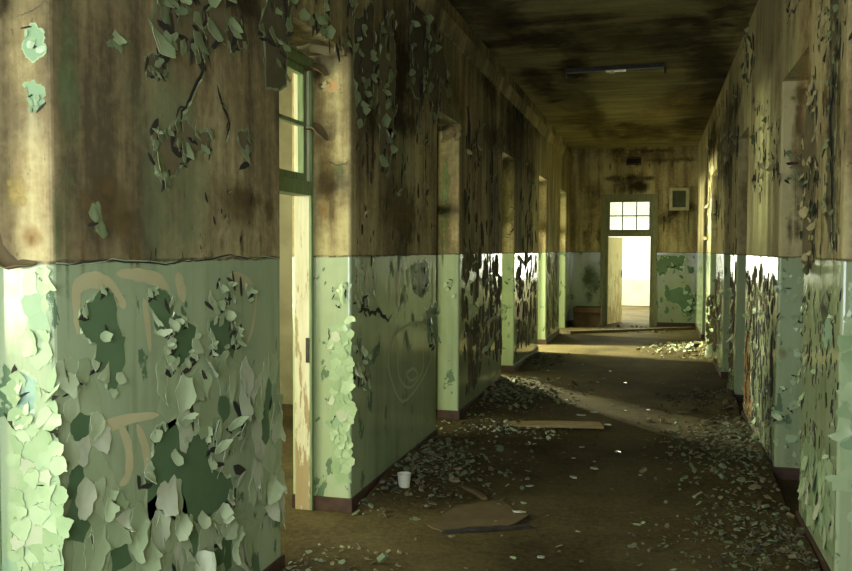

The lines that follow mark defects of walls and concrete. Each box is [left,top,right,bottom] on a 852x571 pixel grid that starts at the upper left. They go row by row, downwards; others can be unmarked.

peeling [21,22,47,63]
peeling [22,79,46,113]
peeling [144,0,433,221]
leakage [394,31,413,139]
peeling [410,257,441,351]
peeling [441,106,538,395]
peeling [546,253,558,334]
peeling [0,265,287,571]
peeling [325,255,392,485]